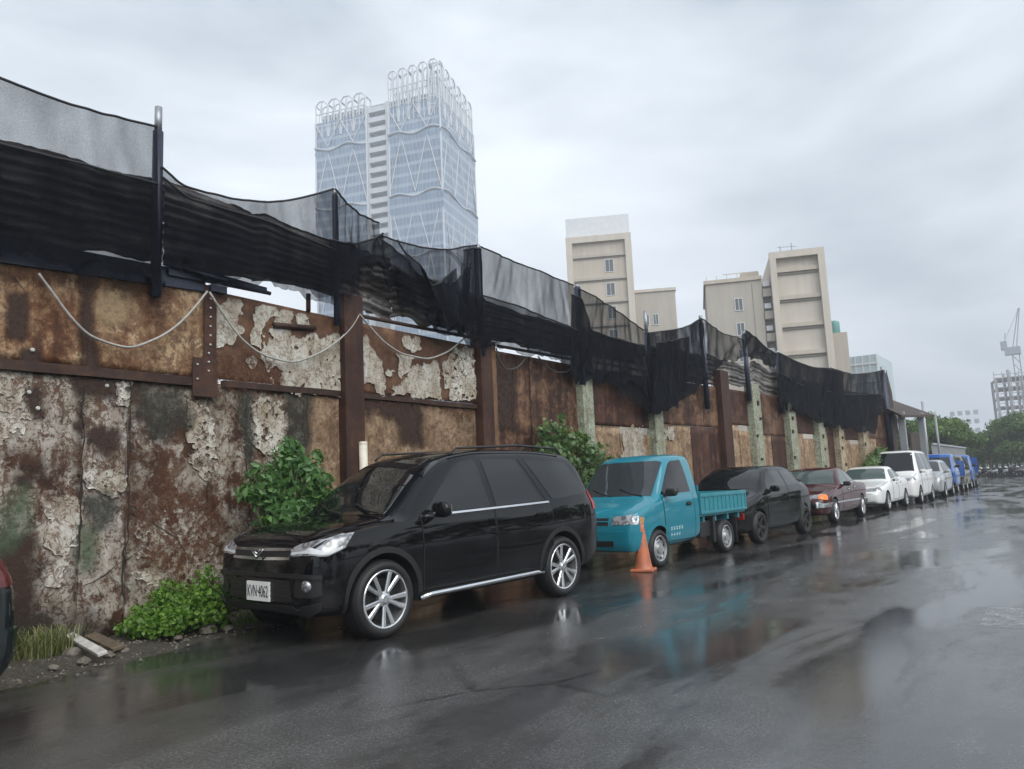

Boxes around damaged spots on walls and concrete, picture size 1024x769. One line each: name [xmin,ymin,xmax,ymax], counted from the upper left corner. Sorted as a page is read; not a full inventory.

peeling [0,370,45,446]
corrosion [26,387,44,418]
corrosion [0,268,174,396]
corrosion [0,417,203,486]
peeling [110,380,133,407]
peeling [185,398,220,481]
peeling [217,297,341,457]
corrosion [364,399,424,447]
peeling [363,334,477,402]
corrosion [496,353,516,430]
peeling [41,455,128,588]
crack [67,382,193,605]